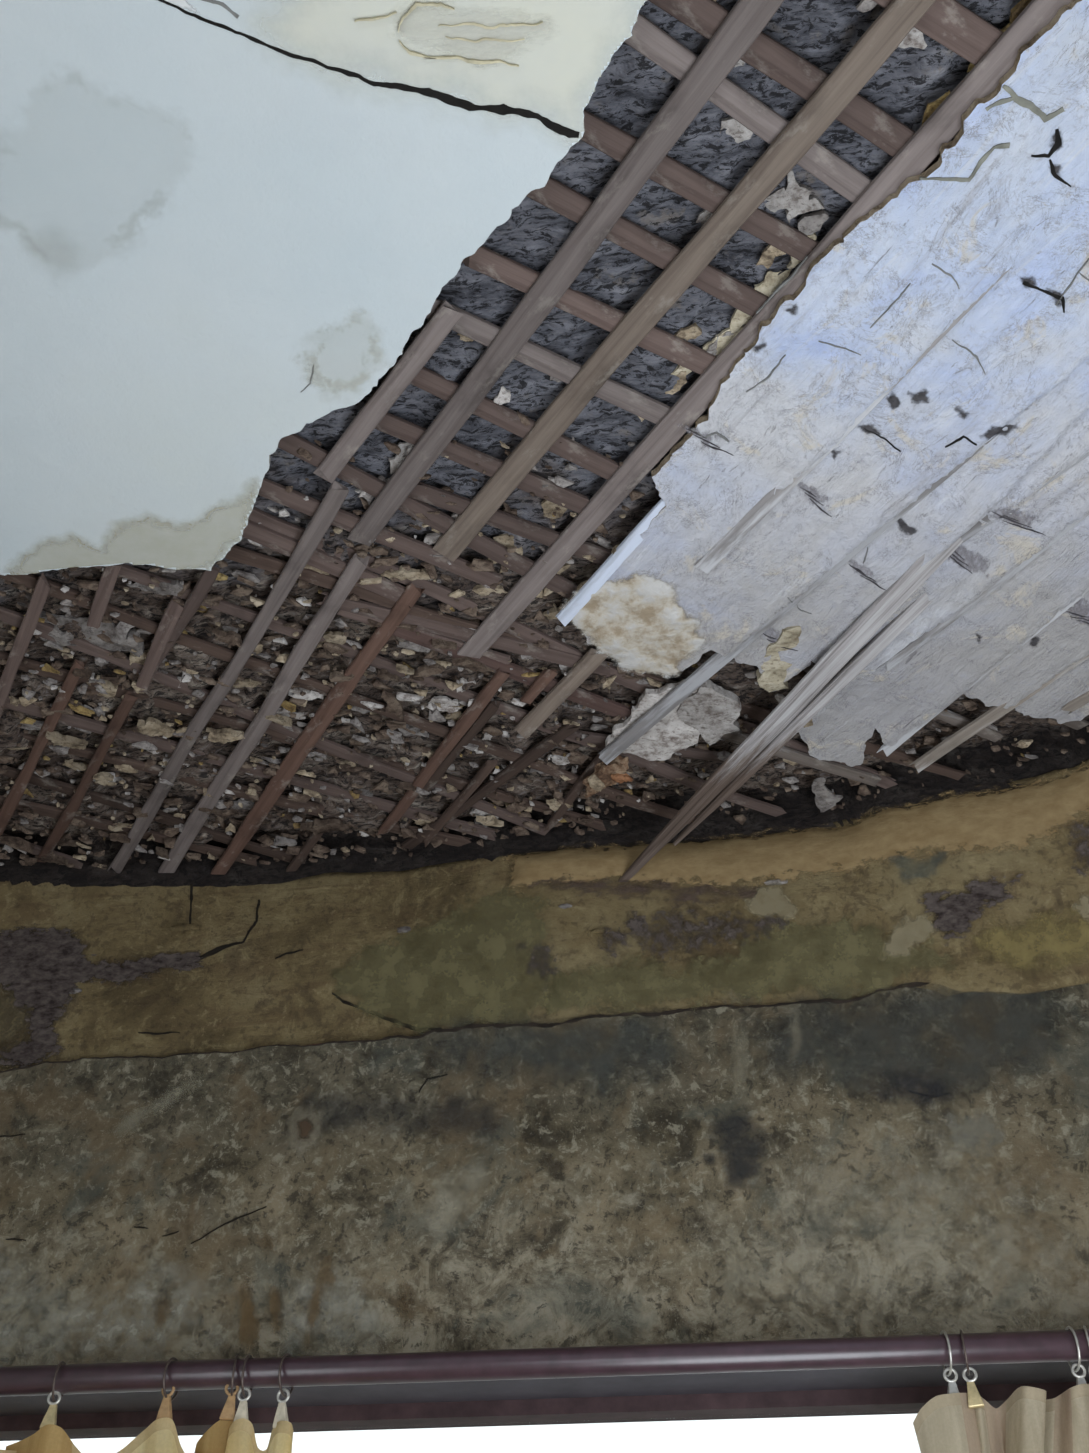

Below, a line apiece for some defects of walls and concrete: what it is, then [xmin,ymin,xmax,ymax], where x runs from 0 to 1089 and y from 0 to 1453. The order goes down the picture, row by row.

crack [158,0,580,138]
flaking render [0,0,1089,1071]
crack [0,982,929,1073]
damp [705,1116,764,1184]